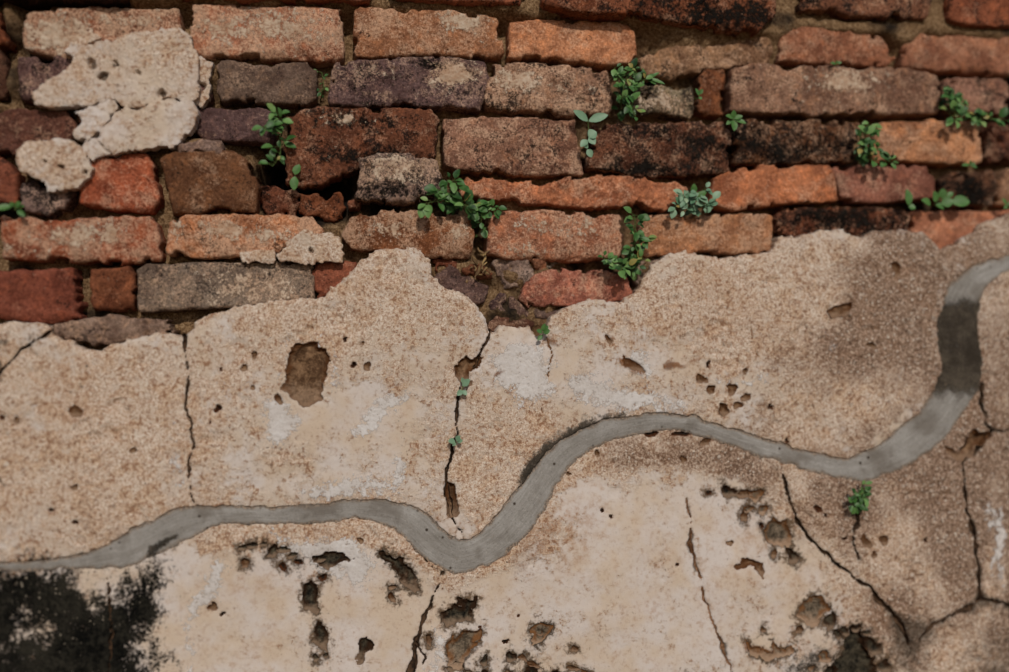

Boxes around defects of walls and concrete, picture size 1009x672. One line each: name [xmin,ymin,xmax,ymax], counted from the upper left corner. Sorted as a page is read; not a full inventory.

peeling [16,27,215,194]
crack [0,330,50,374]
water stain [195,263,309,307]
peeling [240,229,344,266]
flaking render [827,302,853,318]
flaking render [891,262,901,279]
crack [182,333,195,503]
crack [444,329,491,533]
crack [782,382,1009,651]
water stain [0,548,232,672]
crack [406,555,444,672]
crack [685,498,732,672]